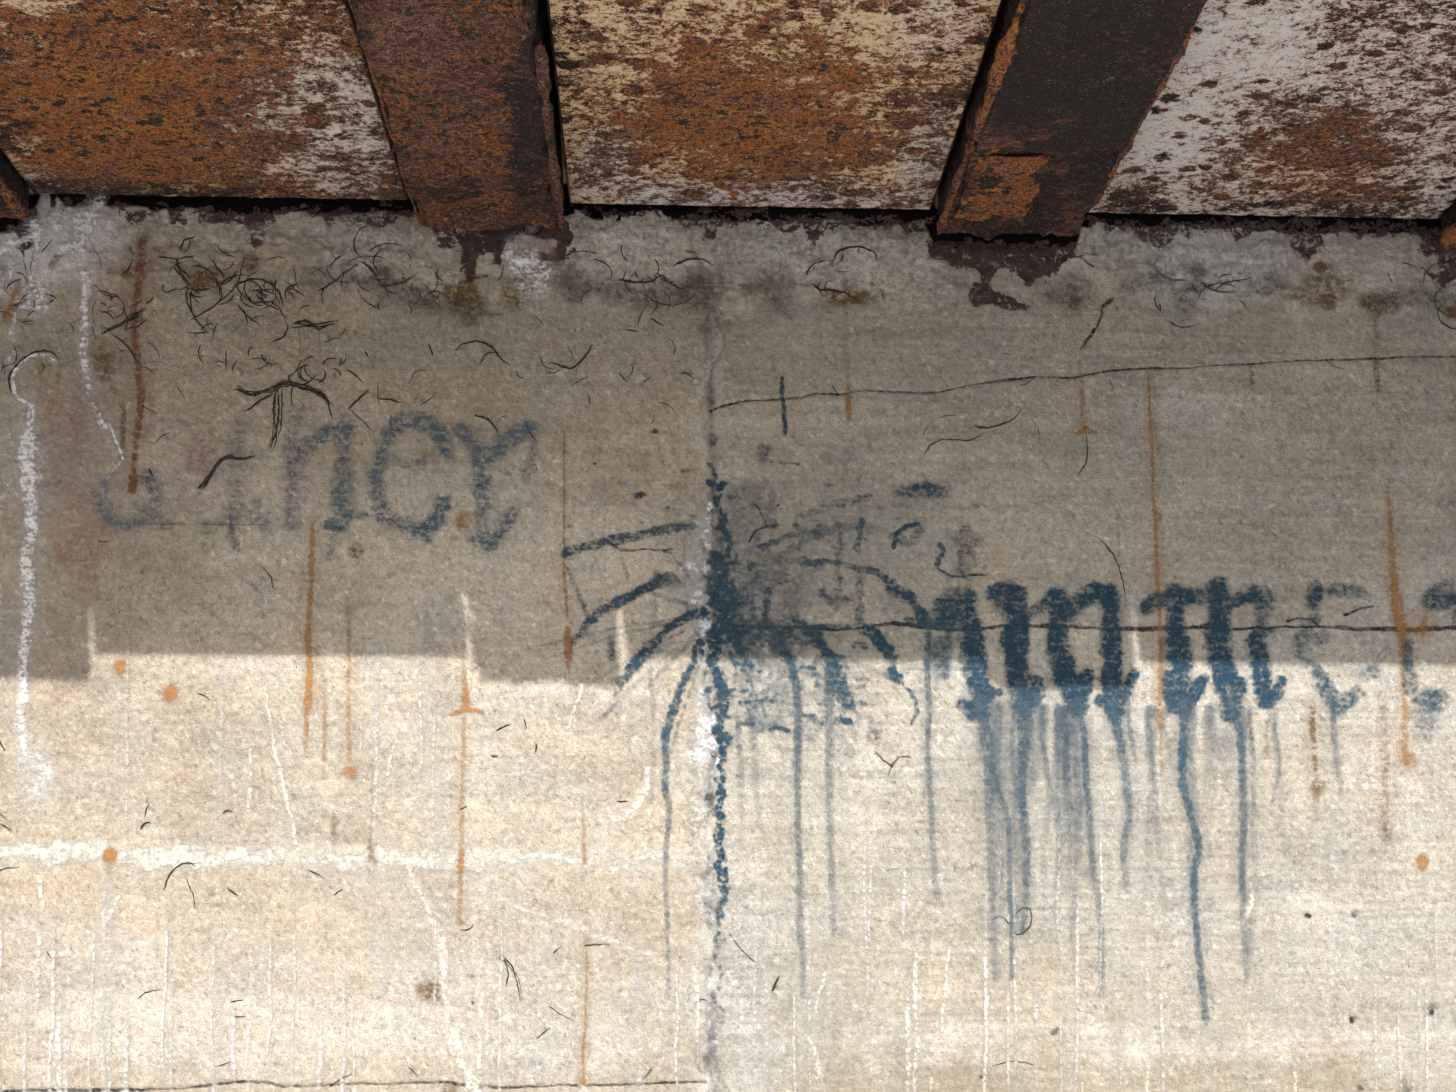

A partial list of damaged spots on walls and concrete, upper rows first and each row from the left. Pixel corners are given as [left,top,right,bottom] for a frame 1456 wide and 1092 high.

leakage [501,236,719,331]
corrosion [432,205,1077,320]
corrosion [1085,214,1456,310]
corrosion [59,194,419,492]
crack [710,298,1454,411]
leakage [0,196,124,795]
corrosion [304,525,315,744]
crack [716,574,1456,633]
corrosion [1385,487,1428,771]
leakage [358,655,397,839]
corrosion [450,679,484,716]
crack [3,1070,704,1092]